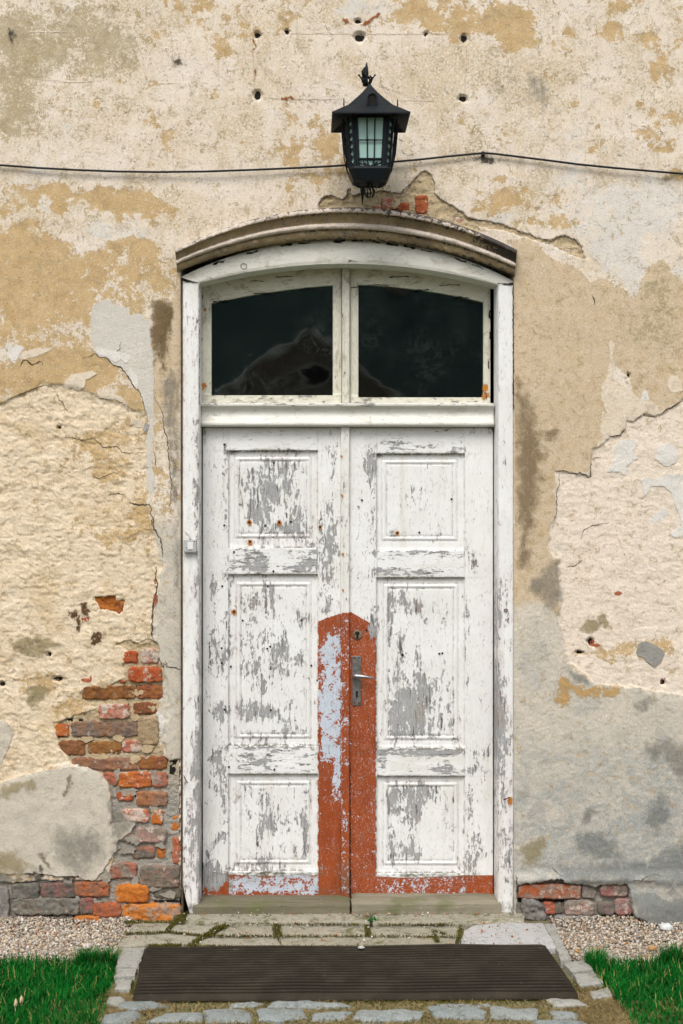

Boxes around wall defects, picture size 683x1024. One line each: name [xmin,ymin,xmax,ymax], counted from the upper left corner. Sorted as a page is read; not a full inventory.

flaking render [318,171,480,232]
flaking render [549,234,593,264]
crack [0,360,68,411]
peeling [63,371,97,391]
peeling [91,299,155,496]
crack [553,402,680,524]
peeling [596,340,683,537]
crack [62,343,180,670]
flaking render [92,596,125,614]
flaking render [0,637,182,924]
flaking render [516,879,646,924]